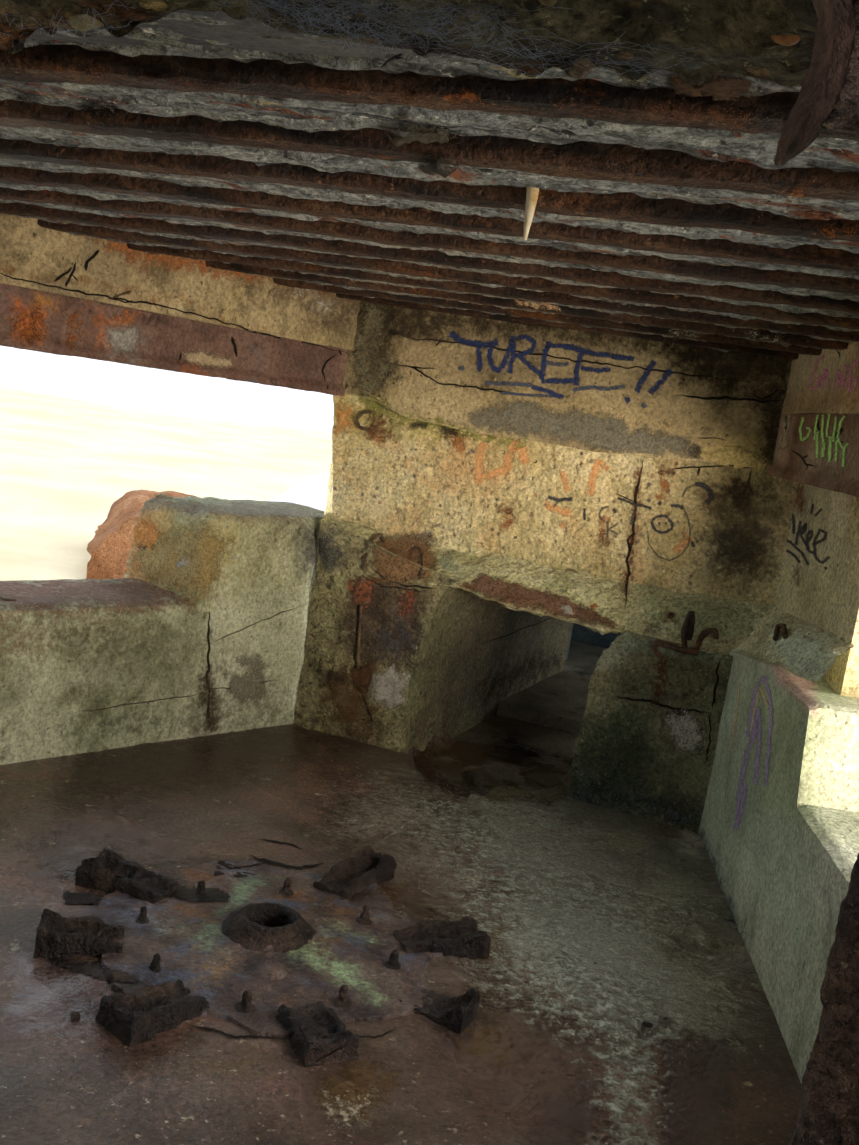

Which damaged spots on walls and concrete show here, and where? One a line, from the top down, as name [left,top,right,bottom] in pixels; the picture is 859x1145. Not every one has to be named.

rust [9,301,49,347]
crack [385,330,816,470]
crack [674,437,752,485]
crack [616,459,644,606]
crack [76,604,305,715]